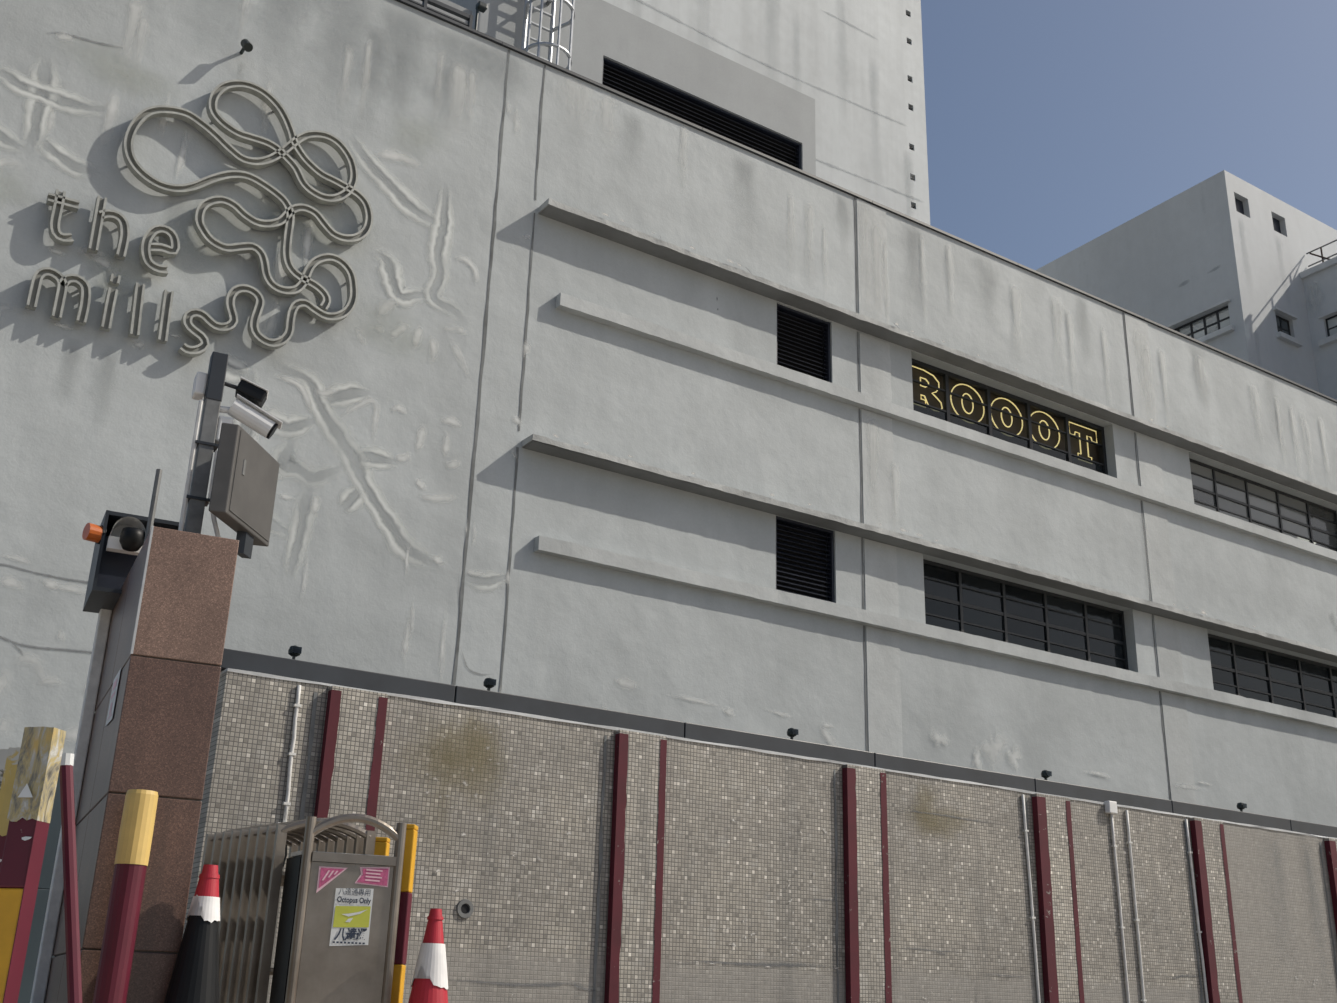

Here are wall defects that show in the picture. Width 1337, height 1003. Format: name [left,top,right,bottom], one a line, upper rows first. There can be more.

crack [0,564,88,584]